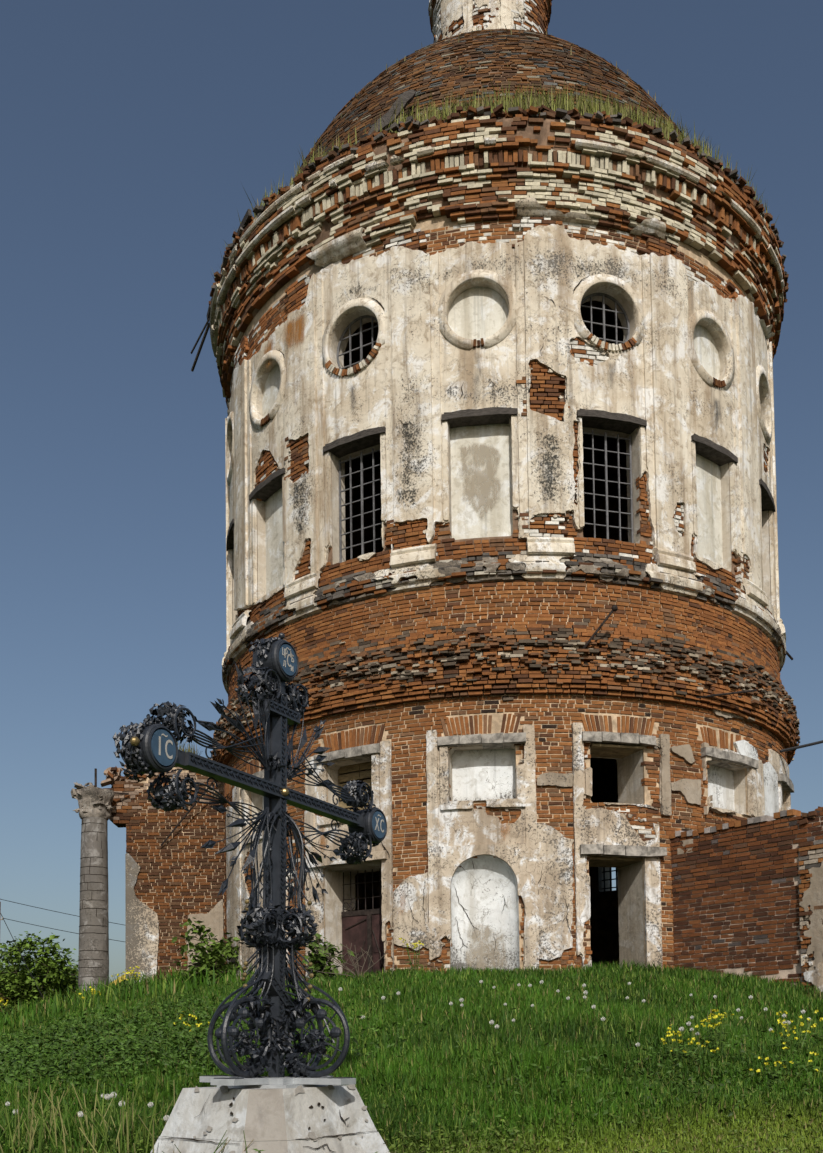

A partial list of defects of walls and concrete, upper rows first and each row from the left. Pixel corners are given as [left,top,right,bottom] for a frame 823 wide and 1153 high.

spalling [255,434,309,501]
mould [395,407,430,509]
spalling [295,360,654,584]
mould [532,431,565,508]
spalling [673,502,750,590]
spalling [238,590,284,623]
peeling [536,743,591,788]
spalling [570,744,747,855]
peeling [125,853,159,982]
peeling [186,806,254,979]
peeling [385,872,452,973]
peeling [799,861,823,991]